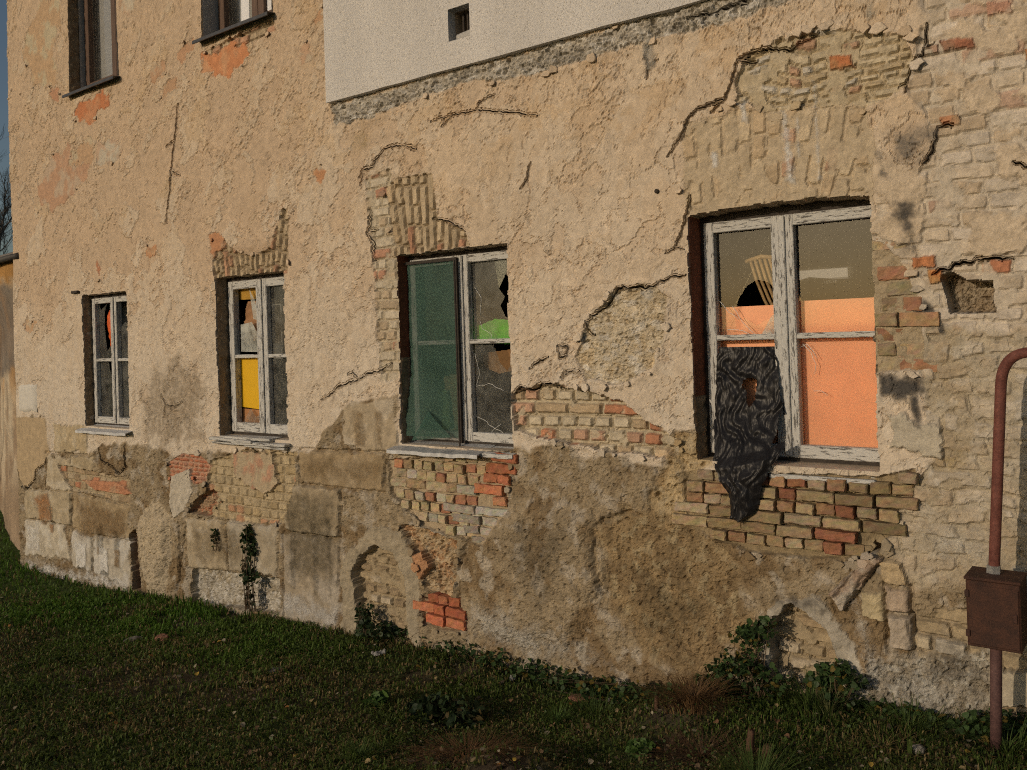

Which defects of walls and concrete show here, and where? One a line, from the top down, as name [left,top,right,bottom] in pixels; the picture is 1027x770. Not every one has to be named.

crack [432,94,538,127]
crack [668,32,820,156]
flaking render [674,19,974,216]
crack [899,24,934,91]
crack [922,122,954,164]
crack [1012,161,1027,169]
flaking render [210,206,290,278]
flaking render [378,174,470,256]
crack [933,255,1013,275]
flaking render [872,238,997,379]
flaking render [513,285,684,461]
flaking render [389,451,519,636]